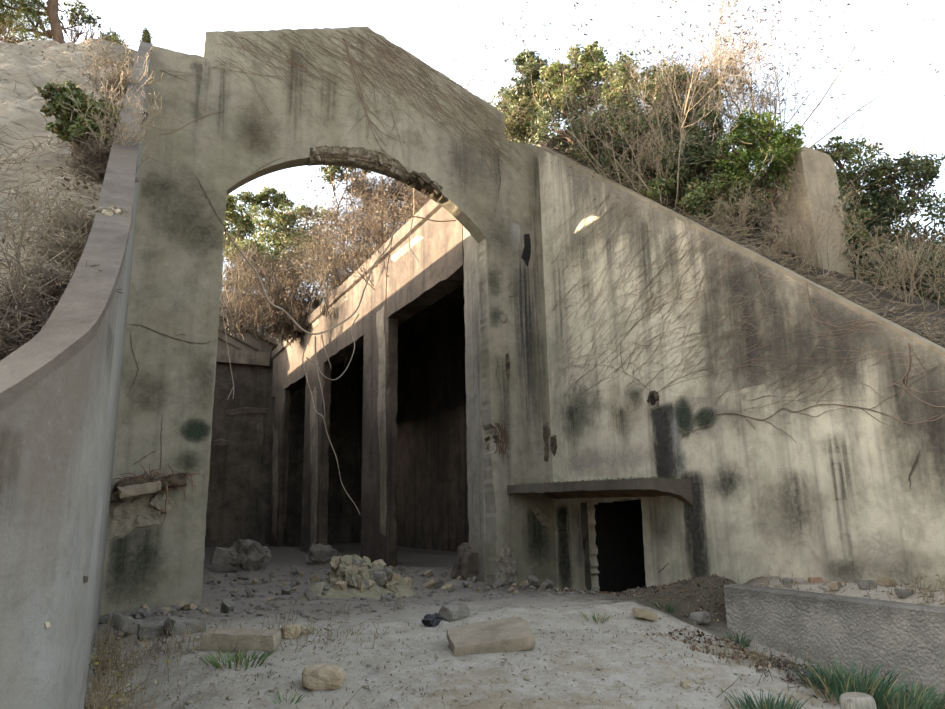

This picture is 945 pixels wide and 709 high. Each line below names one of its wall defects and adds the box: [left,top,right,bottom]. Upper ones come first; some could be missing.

spalling [308,145,443,203]
crack [125,324,216,398]
spalling [106,492,166,541]
damp [557,506,571,589]
damp [651,404,708,578]